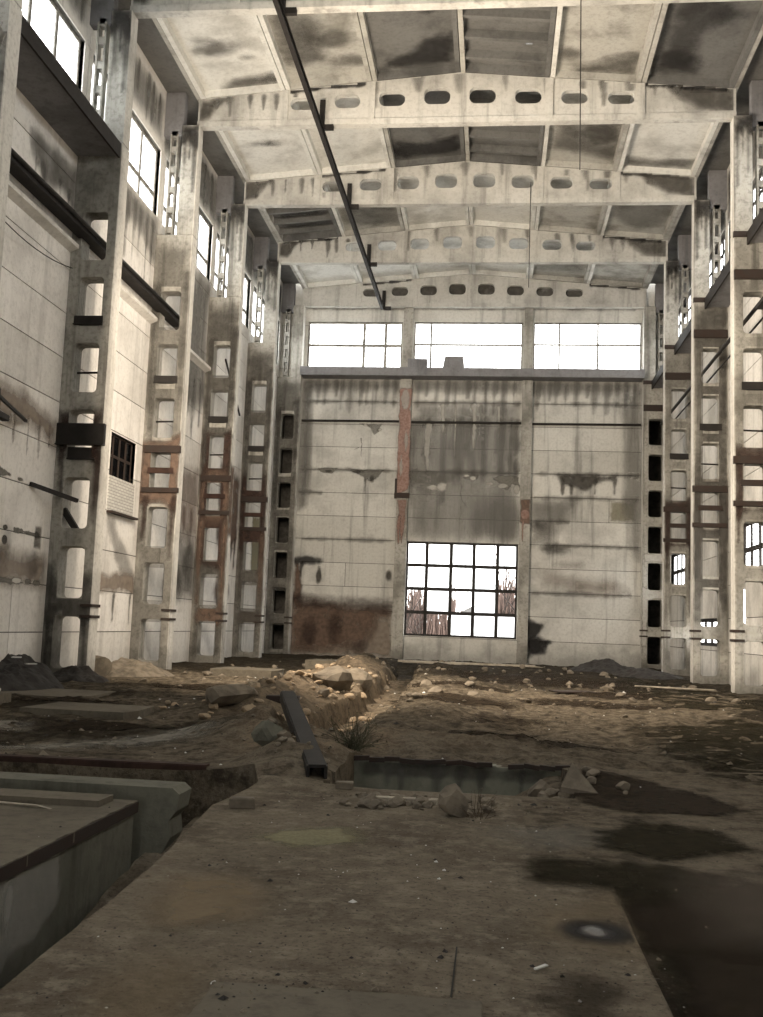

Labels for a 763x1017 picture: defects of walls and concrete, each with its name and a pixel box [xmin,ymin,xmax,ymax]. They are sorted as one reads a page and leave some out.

damp [388,37,453,66]
damp [667,2,728,71]
damp [110,0,366,314]
damp [300,168,397,190]
damp [393,136,460,158]
damp [187,277,239,465]
damp [177,356,396,656]
corrosion [397,500,406,544]
damp [412,404,518,536]
damp [558,474,617,494]
damp [0,528,134,666]
damp [527,620,551,658]